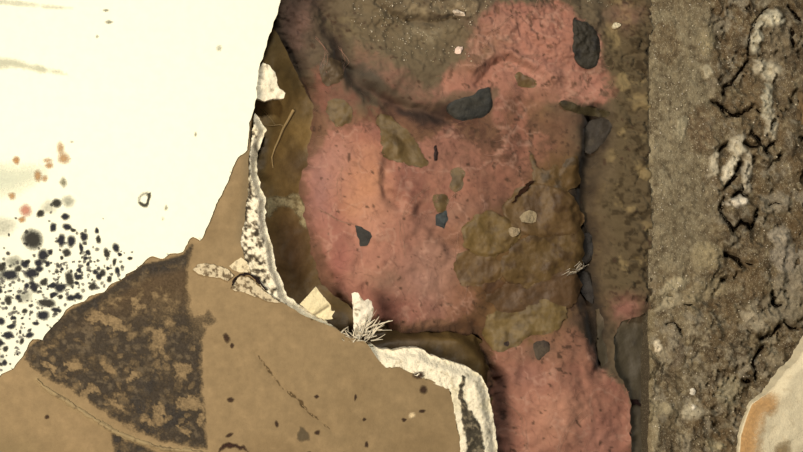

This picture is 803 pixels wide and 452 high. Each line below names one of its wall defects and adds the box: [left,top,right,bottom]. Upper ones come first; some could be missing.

spalling [256,63,285,103]
crack [712,7,780,234]
crack [788,8,801,46]
mould [0,199,213,448]
spalling [241,113,333,327]
crack [721,254,753,281]
mould [112,435,153,452]
mould [219,433,247,451]
spalling [365,340,498,452]
spalling [736,336,803,452]